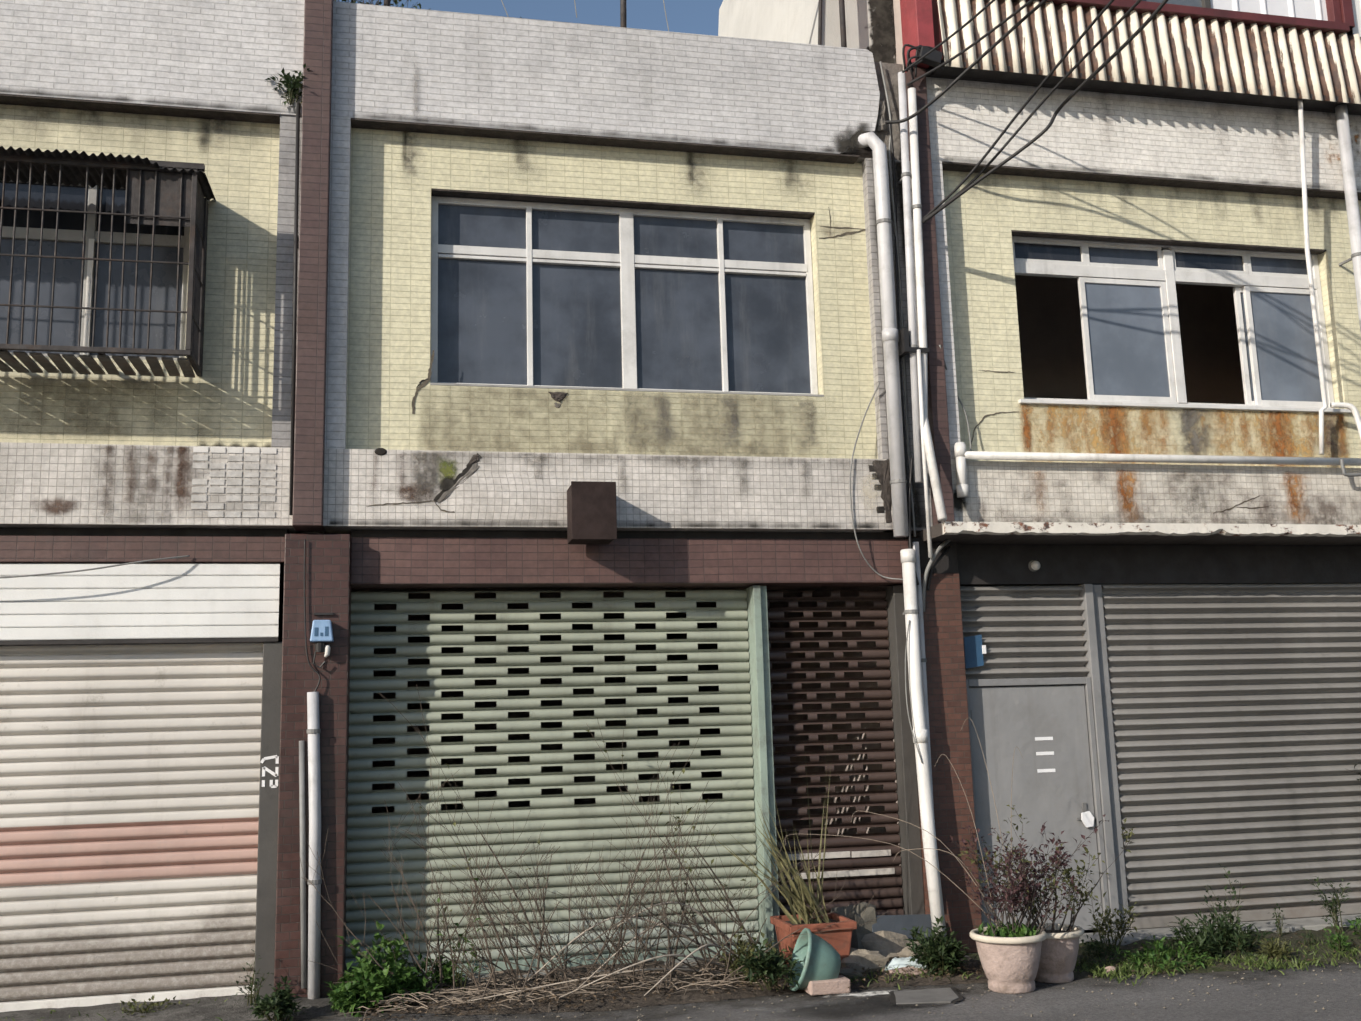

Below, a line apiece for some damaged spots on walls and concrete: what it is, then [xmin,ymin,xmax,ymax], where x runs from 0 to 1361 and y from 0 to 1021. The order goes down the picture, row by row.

crack [412,350,434,414]
spalling [436,463,480,503]
damp [568,435,617,453]
damp [636,401,783,483]
corrosion [1022,405,1165,518]
corrosion [1194,410,1348,521]